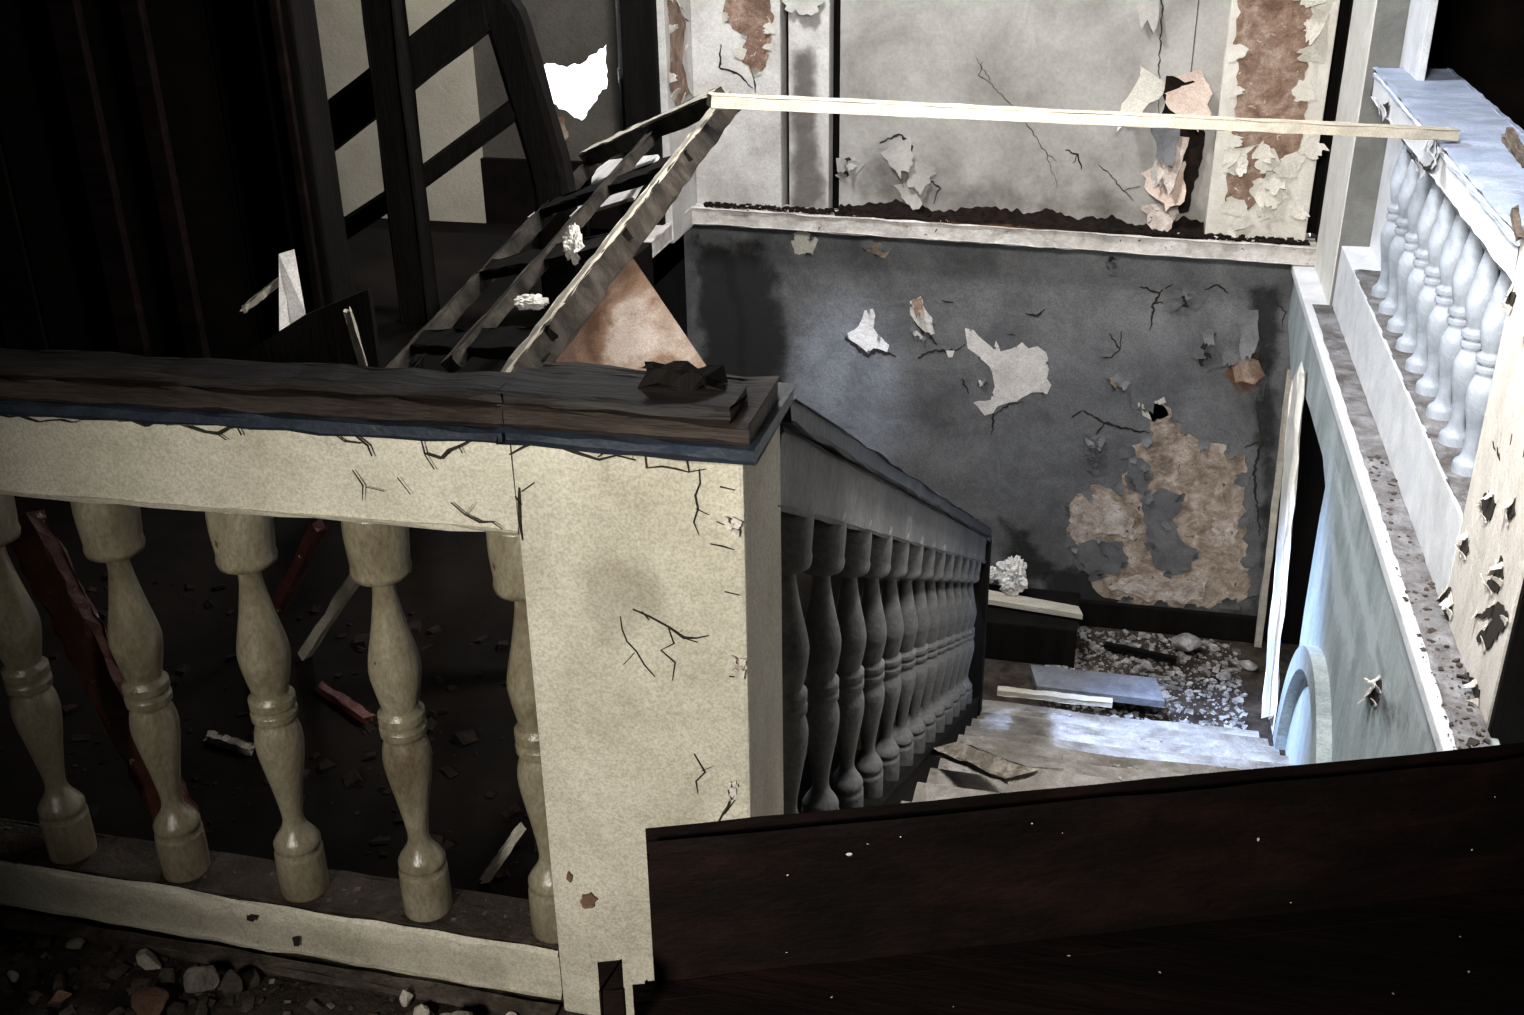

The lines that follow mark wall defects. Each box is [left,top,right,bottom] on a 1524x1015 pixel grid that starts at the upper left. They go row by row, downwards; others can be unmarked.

peeling [720,0,776,77]
peeling [1117,0,1329,238]
peeling [844,308,896,358]
peeling [965,328,1051,416]
crack [337,436,469,500]
crack [451,445,534,541]
crack [565,450,735,550]
flaking render [1061,371,1258,610]
peeling [1476,490,1516,527]
crack [620,609,709,680]
peeling [1437,555,1509,652]
peeling [1462,672,1480,706]